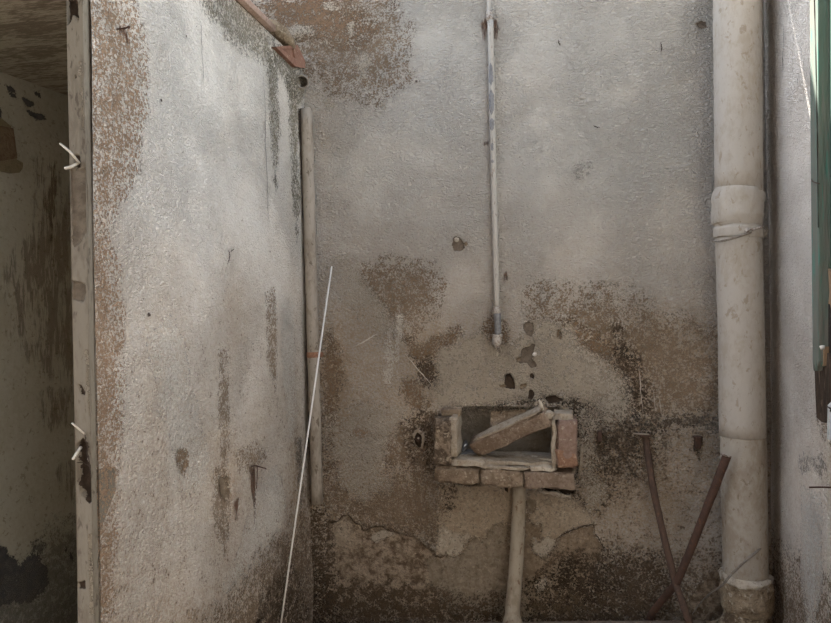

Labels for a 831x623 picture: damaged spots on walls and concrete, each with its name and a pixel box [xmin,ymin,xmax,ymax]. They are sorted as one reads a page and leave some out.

peeling [0,83,46,121]
leakage [199,0,414,243]
peeling [79,438,97,504]
corrosion [236,442,267,502]
leakage [146,252,510,623]
spalling [499,321,537,399]
leakage [464,279,718,512]
spalling [323,515,511,620]